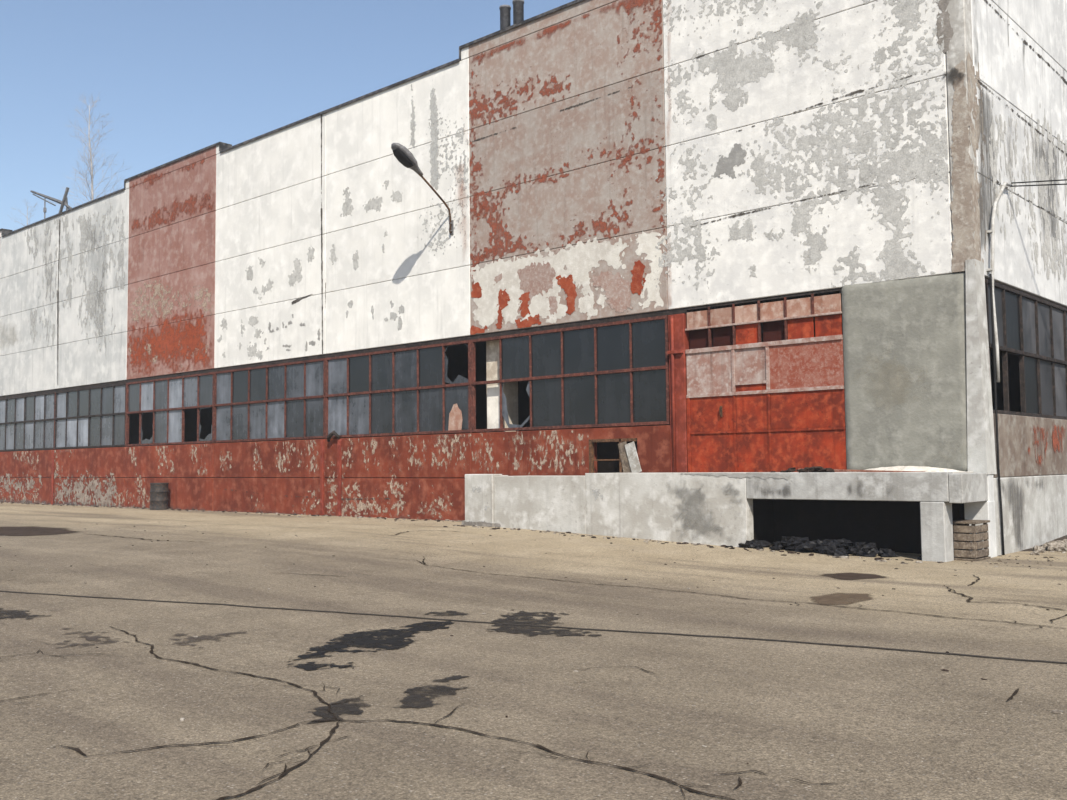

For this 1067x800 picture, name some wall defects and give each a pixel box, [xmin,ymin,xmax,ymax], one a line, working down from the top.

peeling [340,180,402,217]
peeling [410,0,1067,335]
damp [980,90,995,243]
damp [1035,148,1057,237]
peeling [27,194,227,374]
peeling [245,259,273,300]
peeling [288,247,315,286]
peeling [239,314,305,360]
peeling [371,301,404,330]
peeling [0,447,150,508]
peeling [275,437,452,518]
peeling [408,430,589,474]